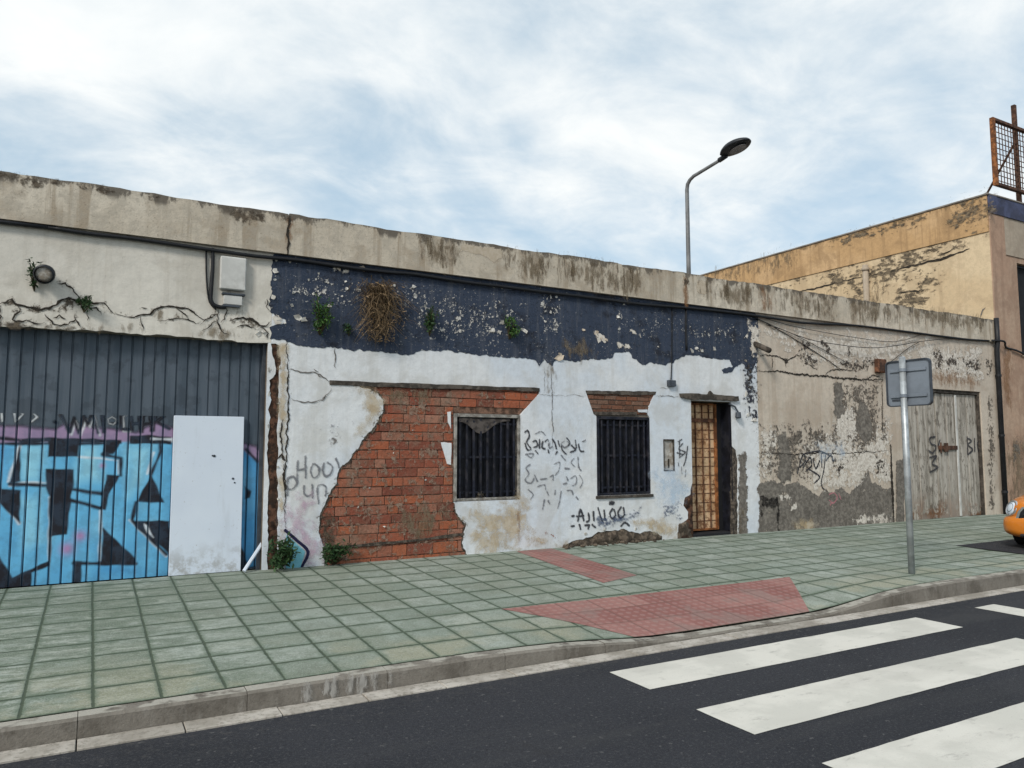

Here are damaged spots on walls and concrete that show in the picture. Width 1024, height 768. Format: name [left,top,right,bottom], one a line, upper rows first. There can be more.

leakage [0,172,62,188]
leakage [230,210,265,222]
peeling [272,266,367,324]
peeling [393,285,528,339]
leakage [513,255,549,276]
leakage [562,261,641,295]
leakage [715,194,996,329]
crack [802,249,968,293]
crack [0,281,336,527]
peeling [539,295,995,539]
flaking render [317,385,539,565]
spalling [545,527,664,549]